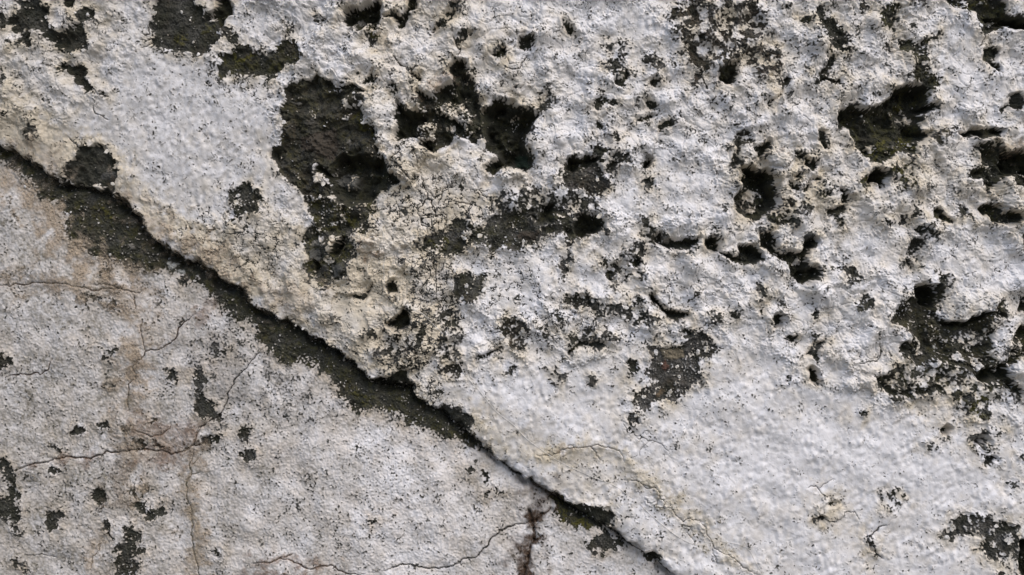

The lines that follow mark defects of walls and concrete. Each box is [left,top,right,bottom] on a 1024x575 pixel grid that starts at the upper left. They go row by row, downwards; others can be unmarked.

leakage [0,177,140,315]
peeling [0,0,875,453]
spalling [837,0,1024,269]
leakage [109,338,154,482]
crack [0,140,674,575]
crack [546,429,752,572]
spalling [876,273,1024,467]
peeling [941,511,1024,575]